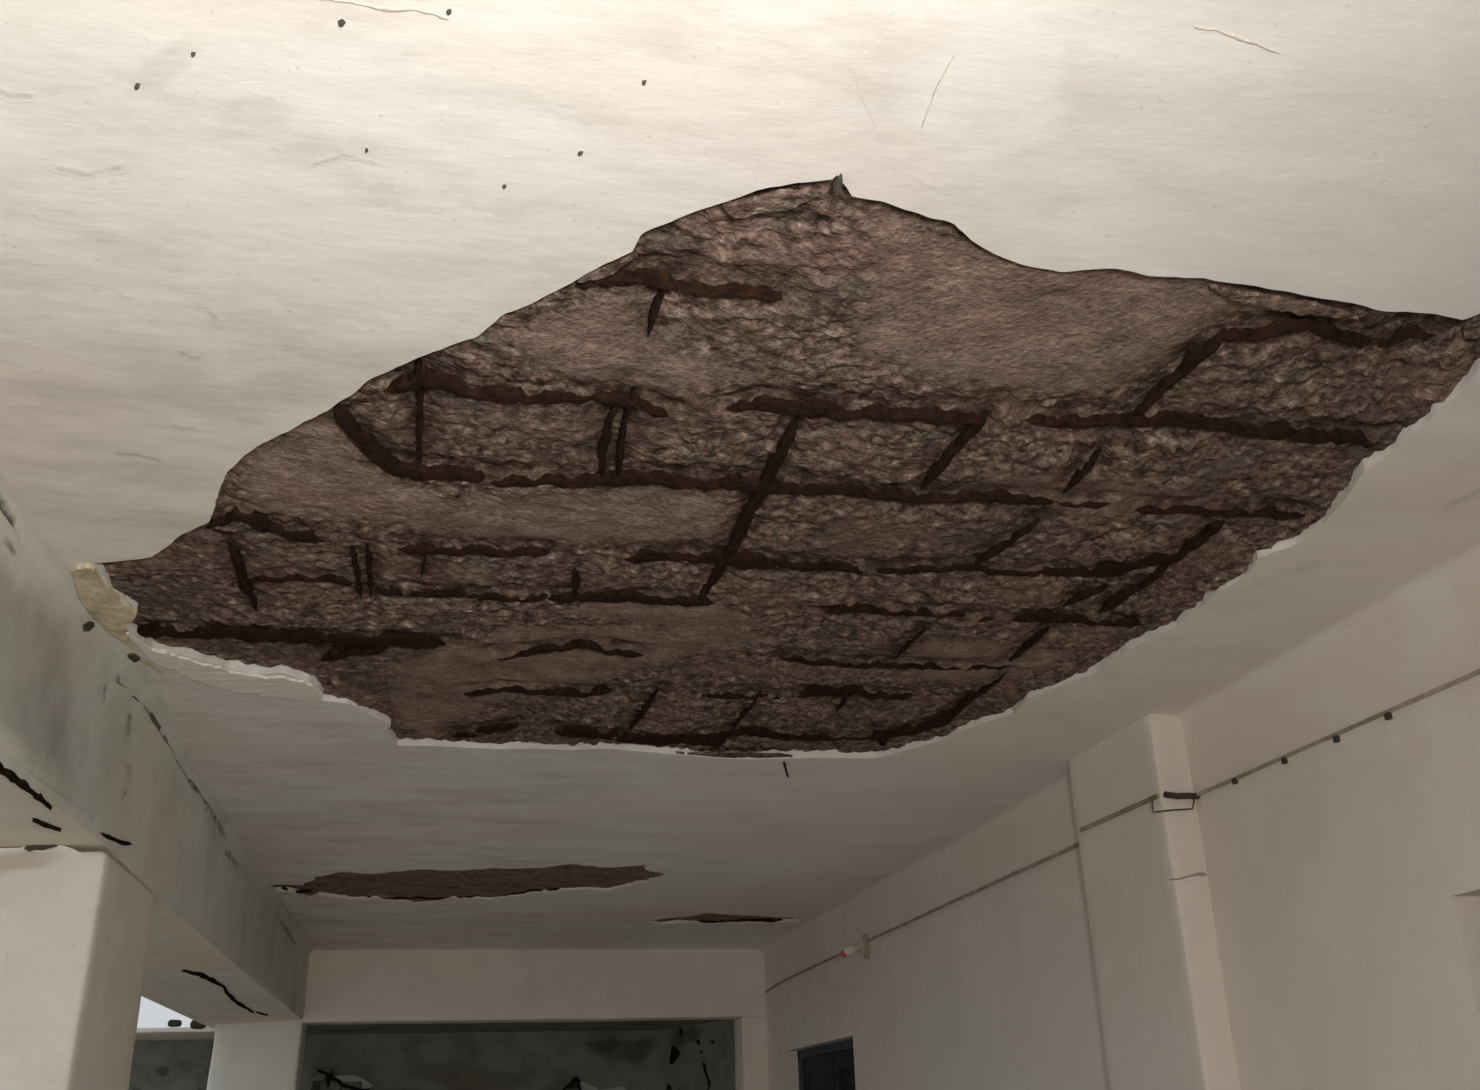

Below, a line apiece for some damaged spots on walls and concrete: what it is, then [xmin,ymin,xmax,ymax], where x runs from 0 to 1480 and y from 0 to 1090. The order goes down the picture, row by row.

crack [331,0,450,20]
flaking render [71,173,1480,758]
crack [0,762,61,852]
crack [101,833,132,845]
flaking render [273,864,662,902]
flaking render [654,913,795,923]
crack [182,969,268,1016]
flaking render [310,1068,369,1090]
flaking render [561,1076,582,1090]